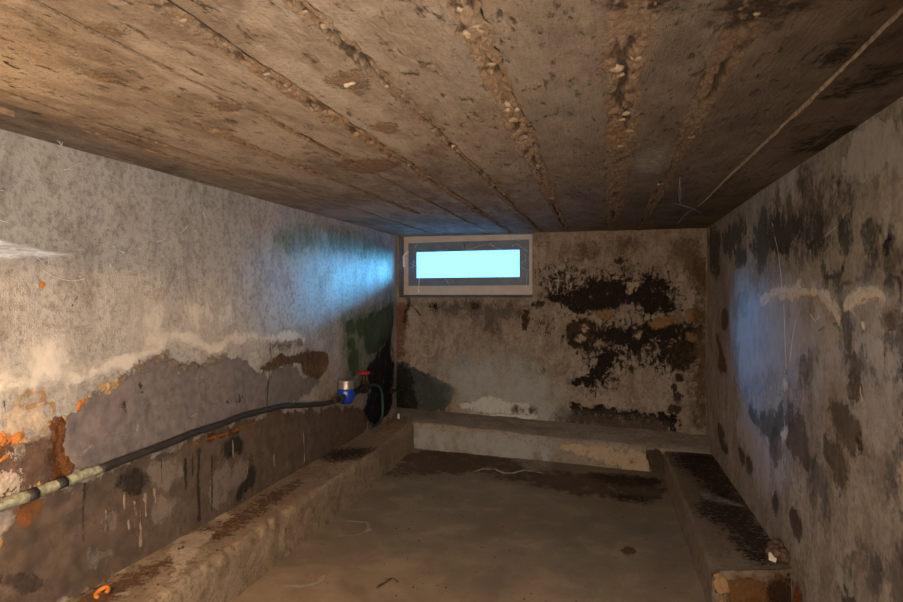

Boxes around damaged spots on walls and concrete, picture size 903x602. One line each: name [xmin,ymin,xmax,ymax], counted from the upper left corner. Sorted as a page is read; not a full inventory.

damp [791,115,903,255]
flaking render [76,349,228,412]
flaking render [260,338,329,379]
damp [0,168,903,602]
peeling [2,401,75,479]